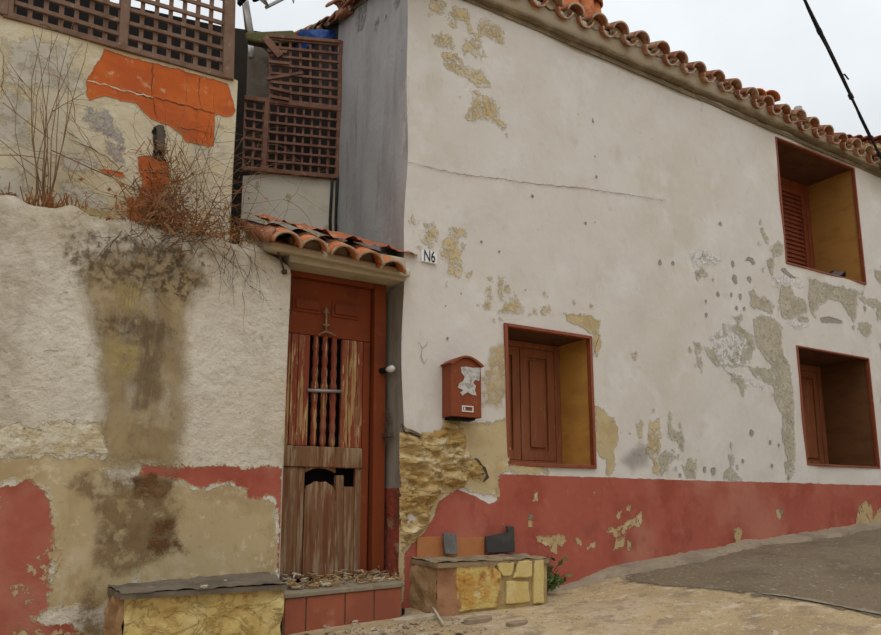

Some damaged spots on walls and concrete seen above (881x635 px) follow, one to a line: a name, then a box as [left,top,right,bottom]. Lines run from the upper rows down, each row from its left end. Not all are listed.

spalling [0,35,236,220]
peeling [428,0,508,137]
crack [407,162,666,201]
water stain [66,235,205,465]
peeling [563,300,602,357]
peeling [689,219,881,480]
water stain [71,474,176,571]
peeling [0,419,280,611]
spalling [398,418,550,602]
peeling [595,406,619,476]
peeling [606,504,642,551]
peeling [629,409,744,481]